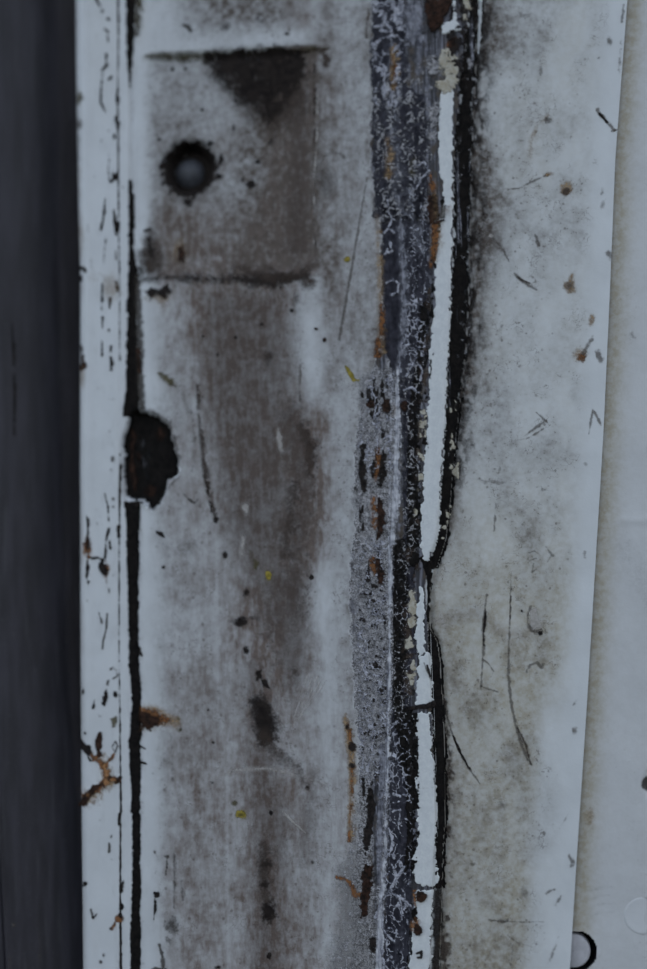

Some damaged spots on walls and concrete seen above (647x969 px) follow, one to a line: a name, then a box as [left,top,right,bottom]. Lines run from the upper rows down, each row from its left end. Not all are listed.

spalling [95,0,112,112]
leakage [146,47,330,126]
rust [424,0,453,33]
spalling [100,199,120,263]
rust [426,174,446,268]
spalling [111,410,181,512]
rust [358,444,387,540]
spalling [85,494,120,584]
spalling [92,667,118,709]
rust [140,707,182,731]
rust [78,732,122,807]
rust [335,717,379,919]